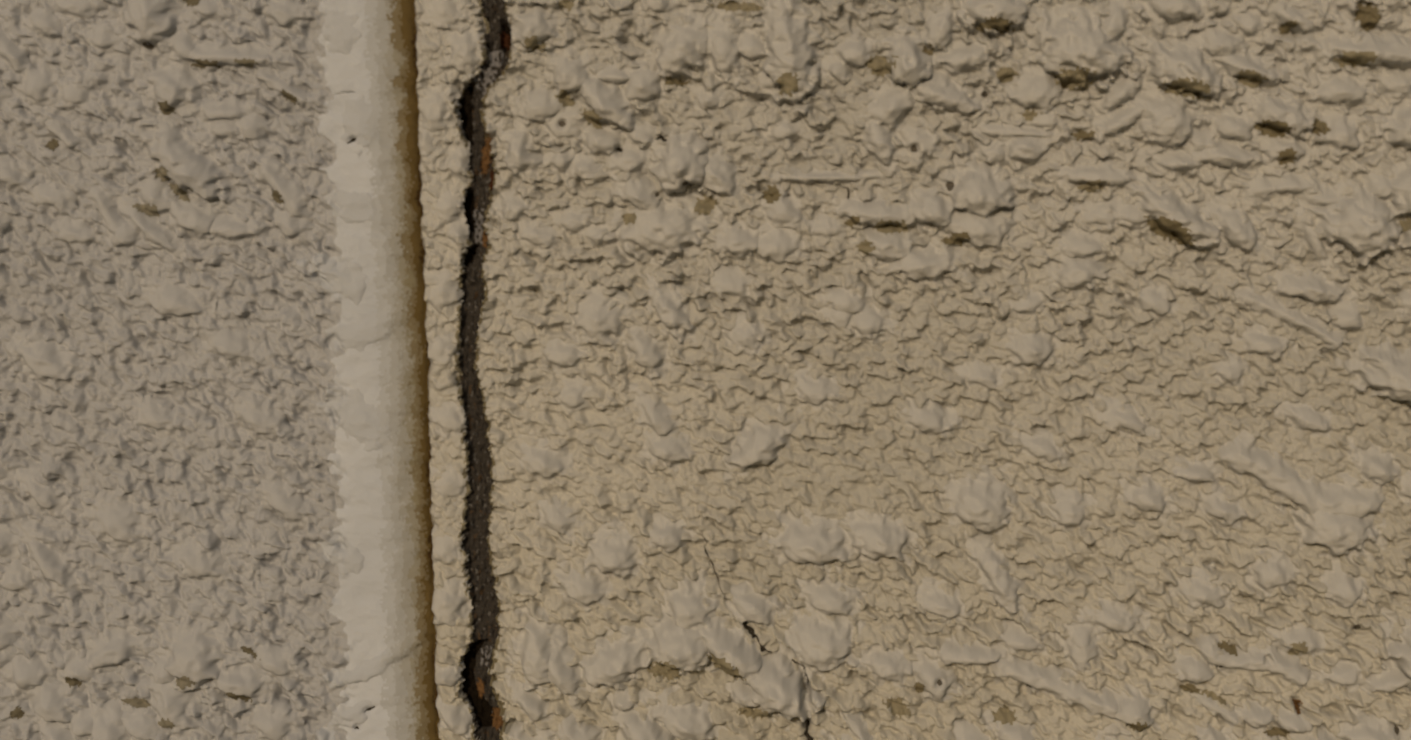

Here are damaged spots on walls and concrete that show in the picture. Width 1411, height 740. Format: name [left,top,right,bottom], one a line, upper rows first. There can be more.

crack [457,0,512,740]
crack [702,531,813,740]